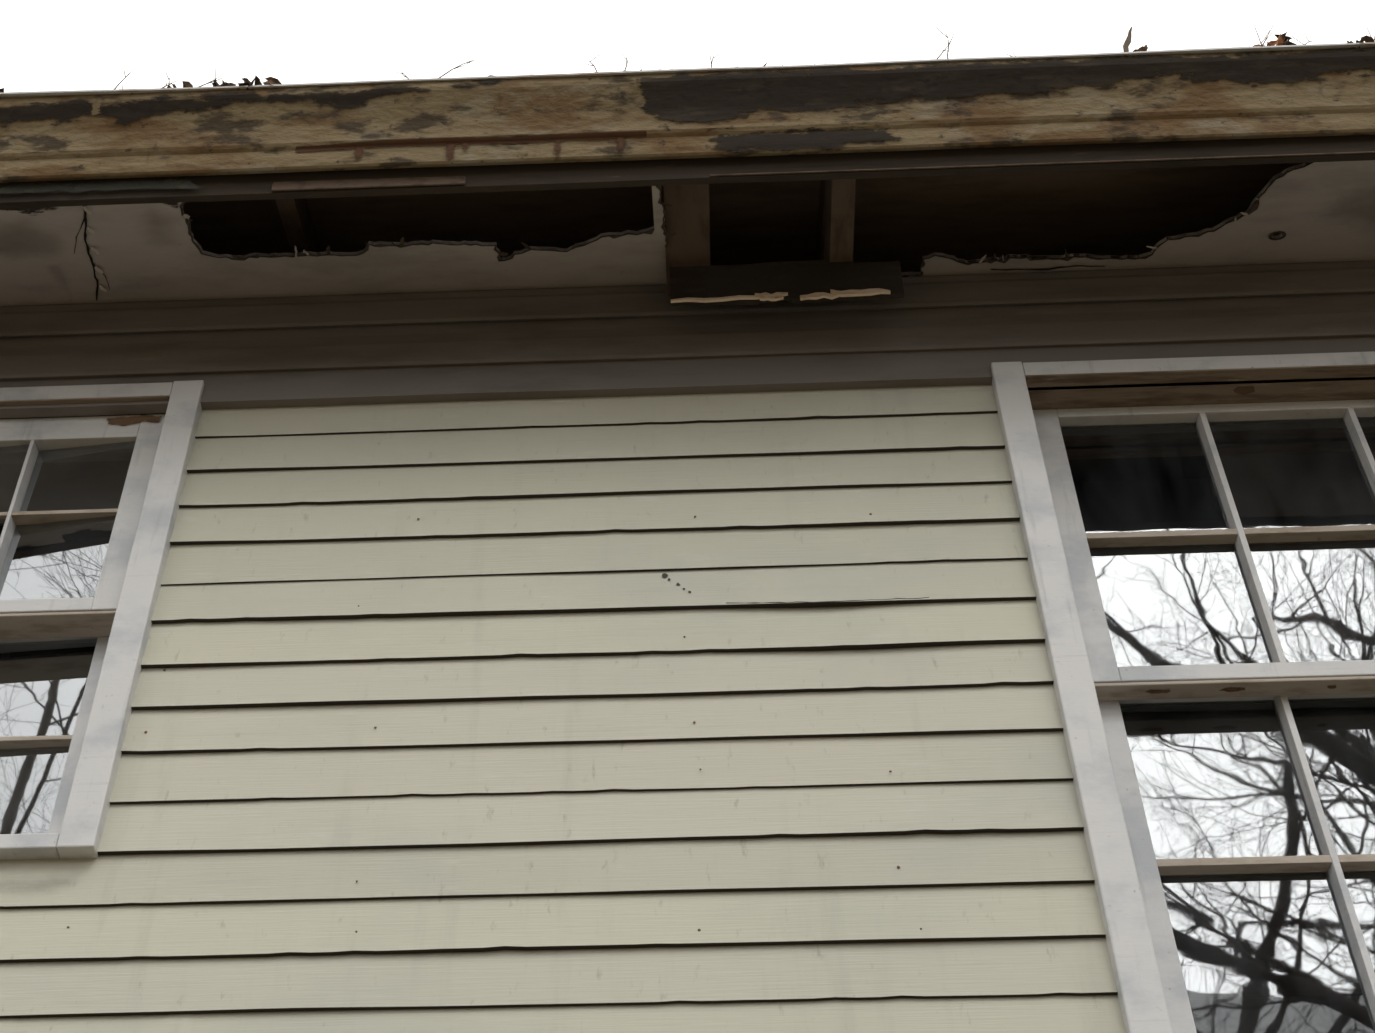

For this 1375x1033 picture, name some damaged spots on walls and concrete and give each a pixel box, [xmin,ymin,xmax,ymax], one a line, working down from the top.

water stain [0,178,199,194]
crack [74,206,110,301]